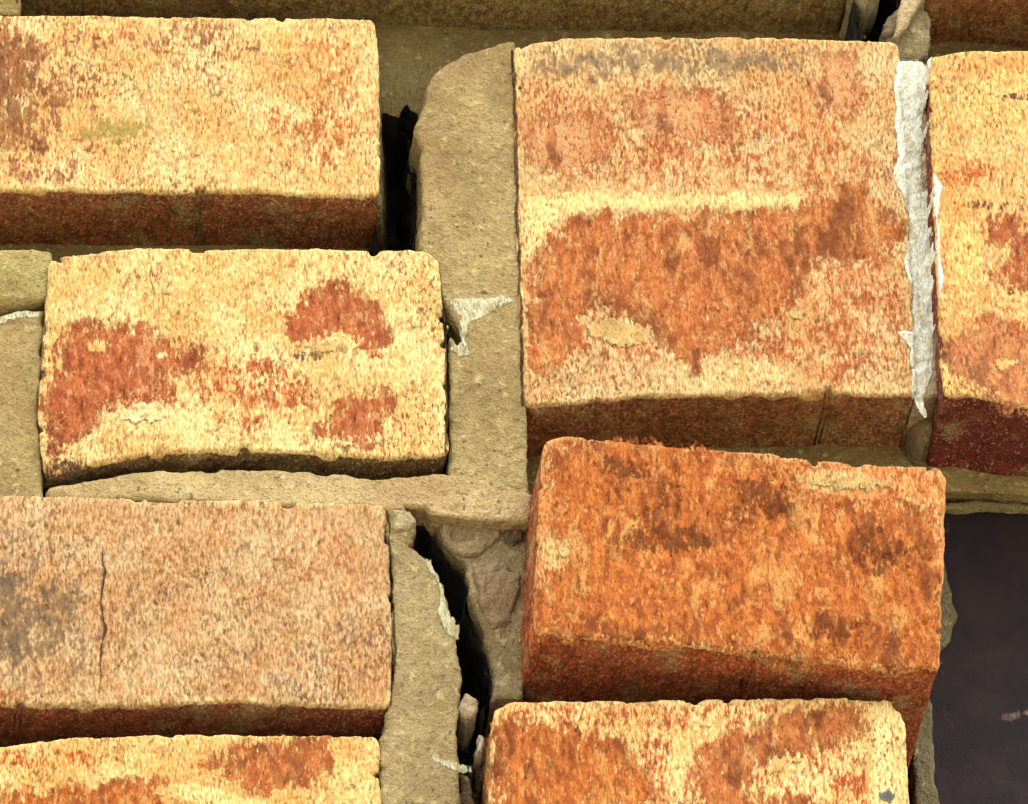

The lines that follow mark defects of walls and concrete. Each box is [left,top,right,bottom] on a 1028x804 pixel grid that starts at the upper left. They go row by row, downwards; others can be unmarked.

crack [844,0,901,42]
crack [372,105,418,256]
damp [893,57,944,418]
crack [439,271,450,457]
crack [387,514,493,803]